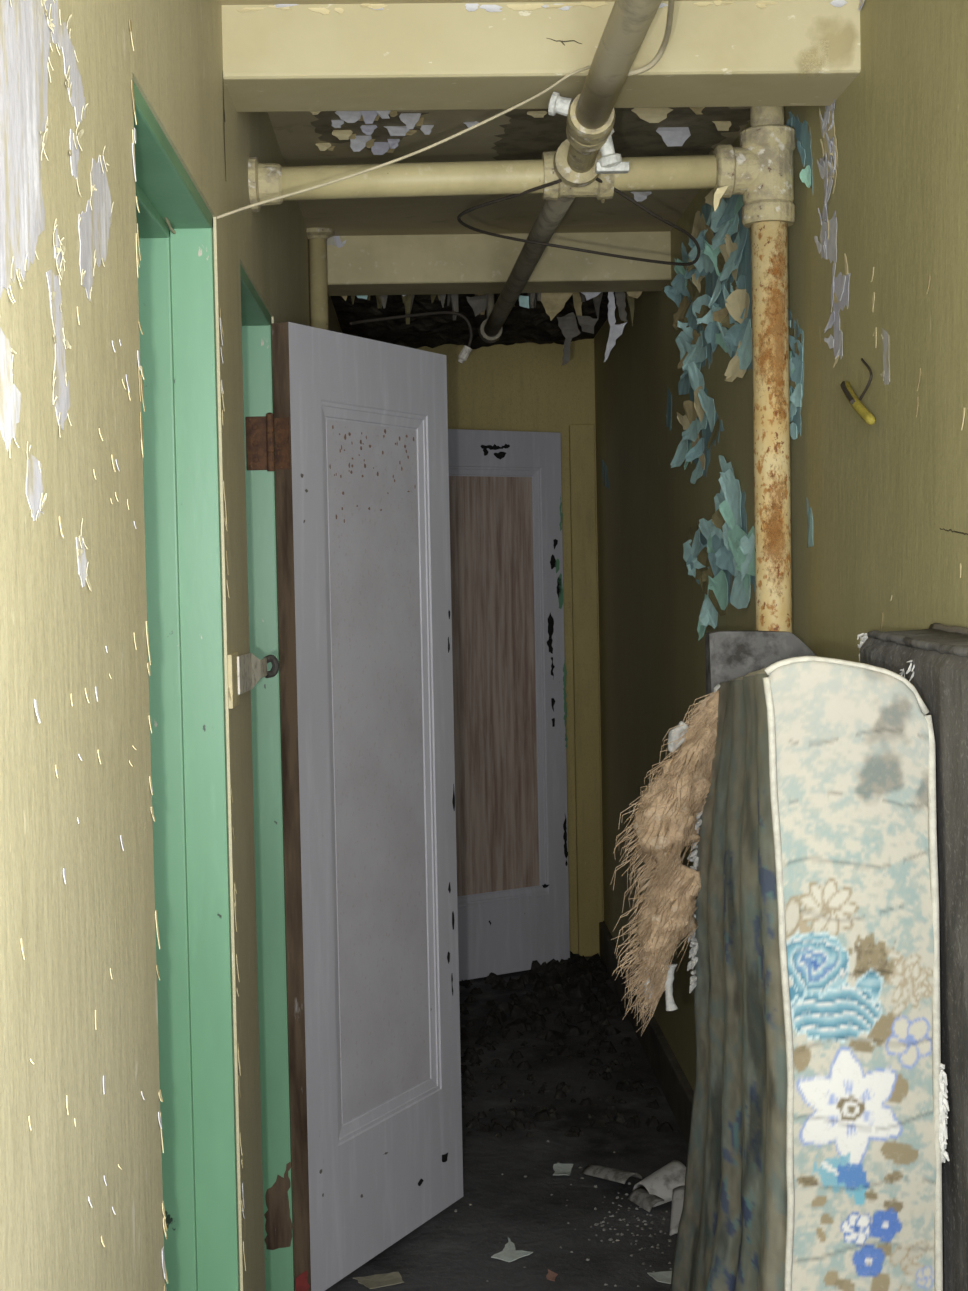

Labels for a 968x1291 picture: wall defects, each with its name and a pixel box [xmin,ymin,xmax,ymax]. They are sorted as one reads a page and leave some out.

peeling [0,0,114,437]
peeling [131,80,141,276]
peeling [309,110,434,155]
peeling [0,315,92,591]
peeling [122,350,145,457]
peeling [664,185,755,641]
rust [755,243,787,418]
peeling [788,308,804,440]
rust [763,476,786,596]
peeling [134,621,151,676]
peeling [141,1089,164,1153]